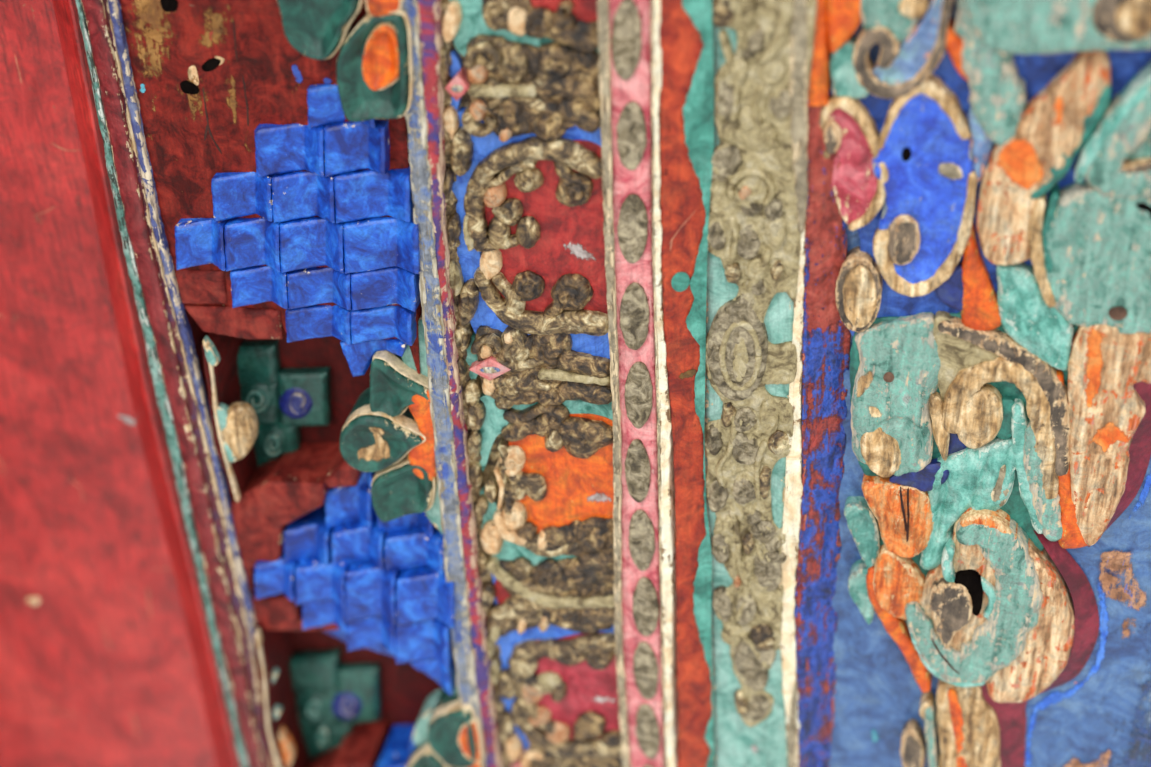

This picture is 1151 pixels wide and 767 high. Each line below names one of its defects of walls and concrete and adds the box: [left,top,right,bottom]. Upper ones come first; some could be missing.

peeling [125,0,178,111]
peeling [177,6,233,120]
peeling [1053,96,1064,125]
peeling [995,139,1044,190]
peeling [1085,327,1104,408]
peeling [1090,422,1129,452]
peeling [1129,474,1151,518]
peeling [1025,551,1151,767]